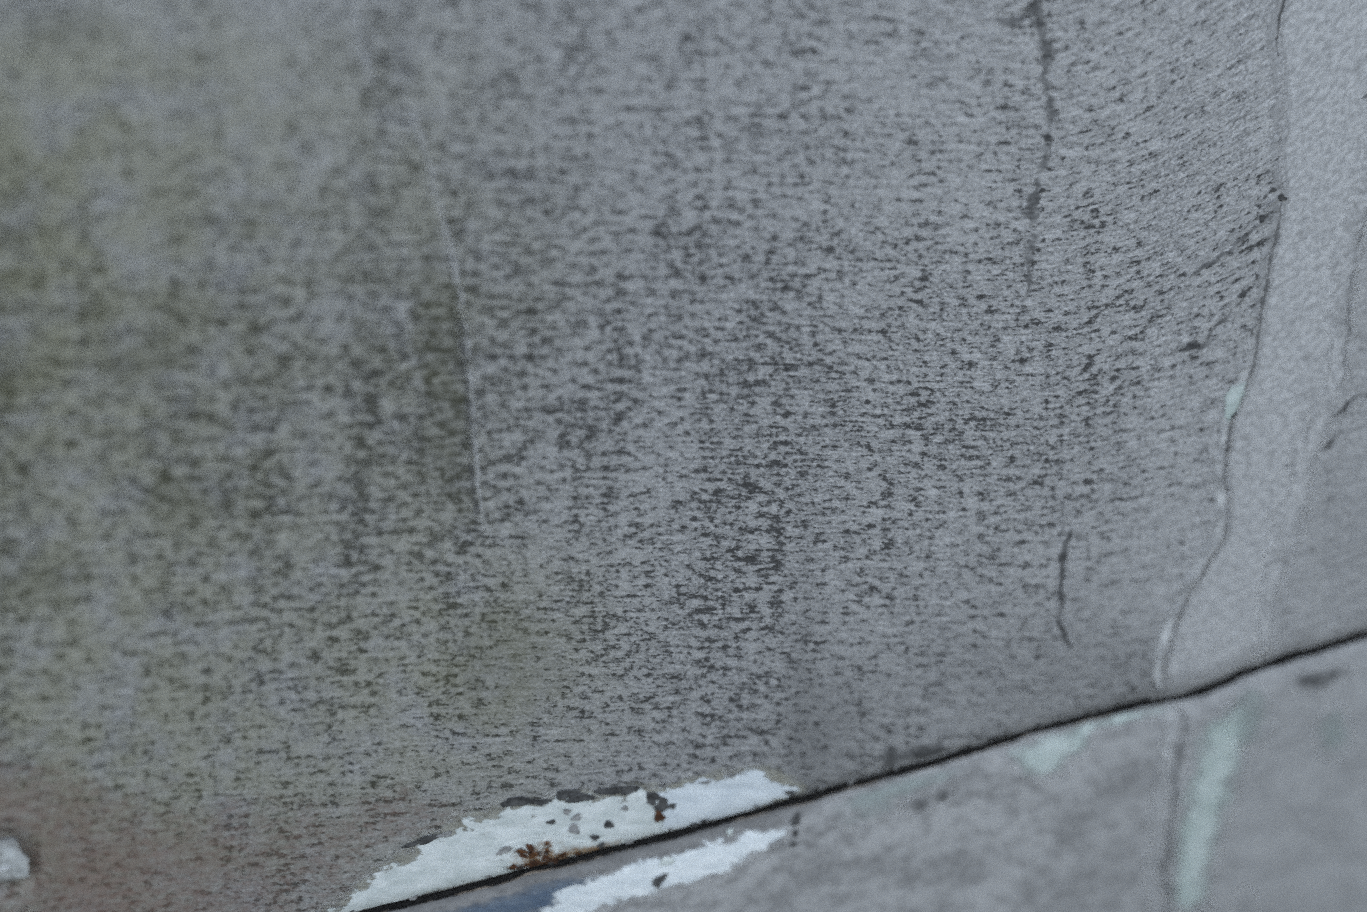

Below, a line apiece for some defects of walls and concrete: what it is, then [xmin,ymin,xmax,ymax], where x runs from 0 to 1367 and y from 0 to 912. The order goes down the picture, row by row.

crack [996,0,1053,294]
crack [1147,0,1288,912]
crack [1327,398,1366,448]
rust [505,841,599,870]
peeling [325,766,805,912]